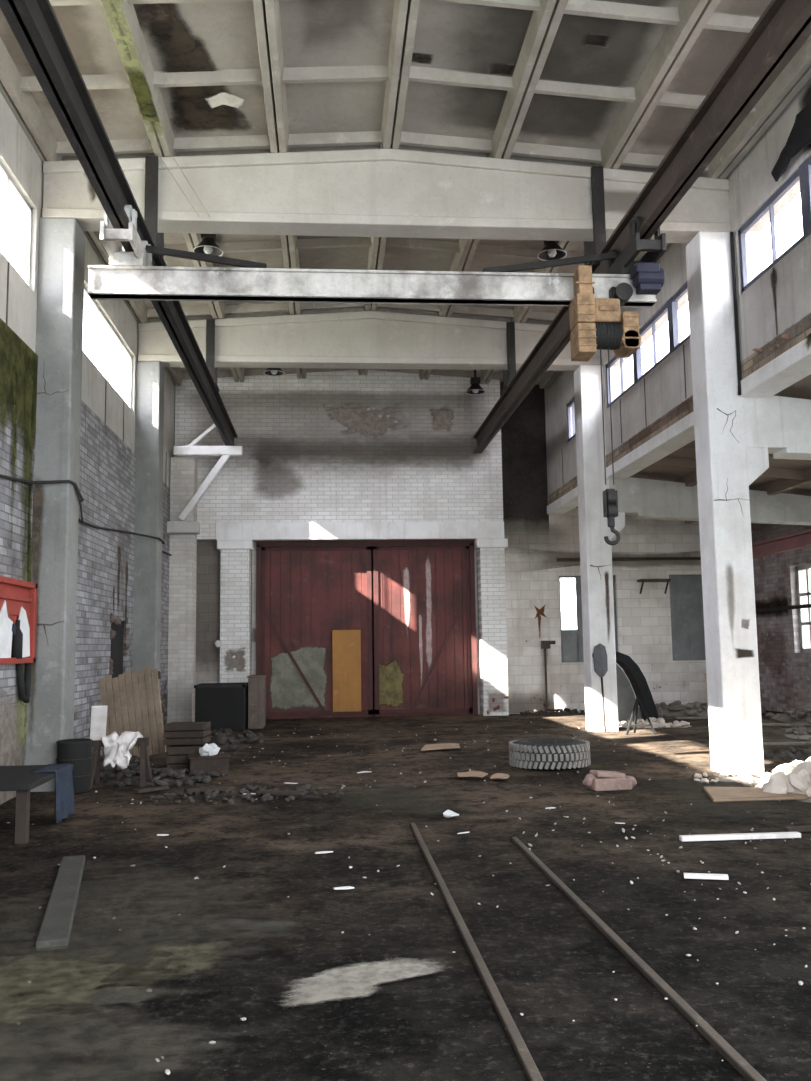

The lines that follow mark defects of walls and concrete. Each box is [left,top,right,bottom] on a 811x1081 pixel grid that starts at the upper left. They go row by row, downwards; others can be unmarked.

leakage [133,3,216,73]
leakage [126,70,158,118]
leakage [171,85,245,130]
peeling [206,92,245,108]
leakage [801,84,811,109]
spalling [753,313,811,362]
leakage [755,597,788,617]